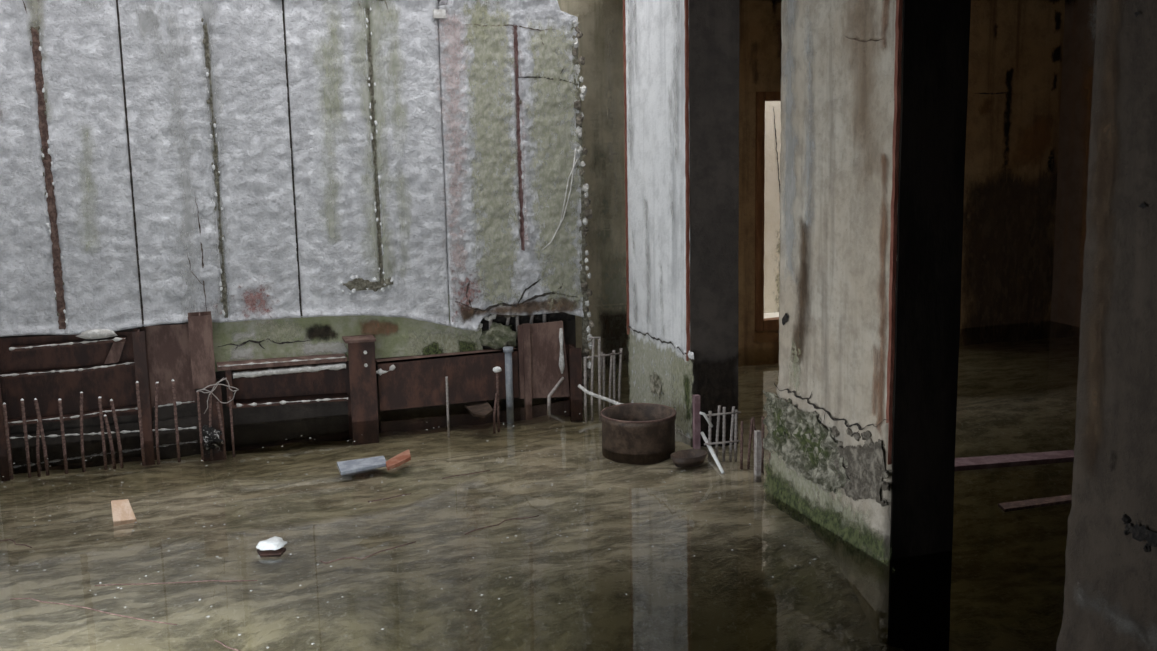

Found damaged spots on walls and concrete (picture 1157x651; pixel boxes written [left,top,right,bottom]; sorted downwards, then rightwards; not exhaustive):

damp [357,0,404,192]
corrosion [239,286,272,317]
crack [774,382,887,435]
damp [763,464,888,570]